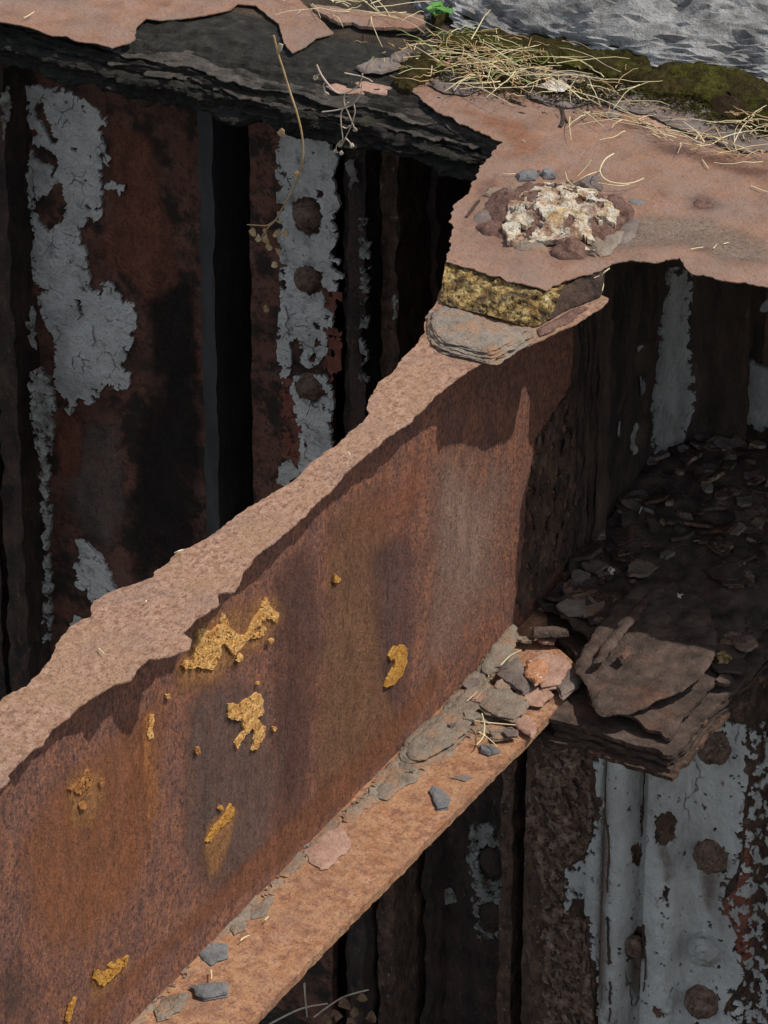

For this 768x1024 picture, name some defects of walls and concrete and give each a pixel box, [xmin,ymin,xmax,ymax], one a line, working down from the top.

peeling [25,84,138,644]
corrosion [132,286,198,572]
peeling [275,132,359,486]
peeling [358,216,372,383]
peeling [640,266,696,454]
corrosion [374,535,413,713]
corrosion [178,598,276,886]
corrosion [200,896,274,966]
corrosion [303,826,351,870]
corrosion [428,786,451,811]
peeling [466,822,502,940]
peeling [526,721,768,1024]